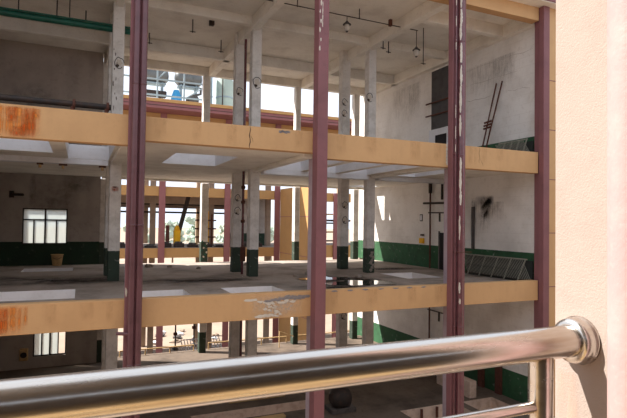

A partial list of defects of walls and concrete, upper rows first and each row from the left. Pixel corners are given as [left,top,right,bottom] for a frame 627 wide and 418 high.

peeling [446,0,463,205]
peeling [244,295,310,318]